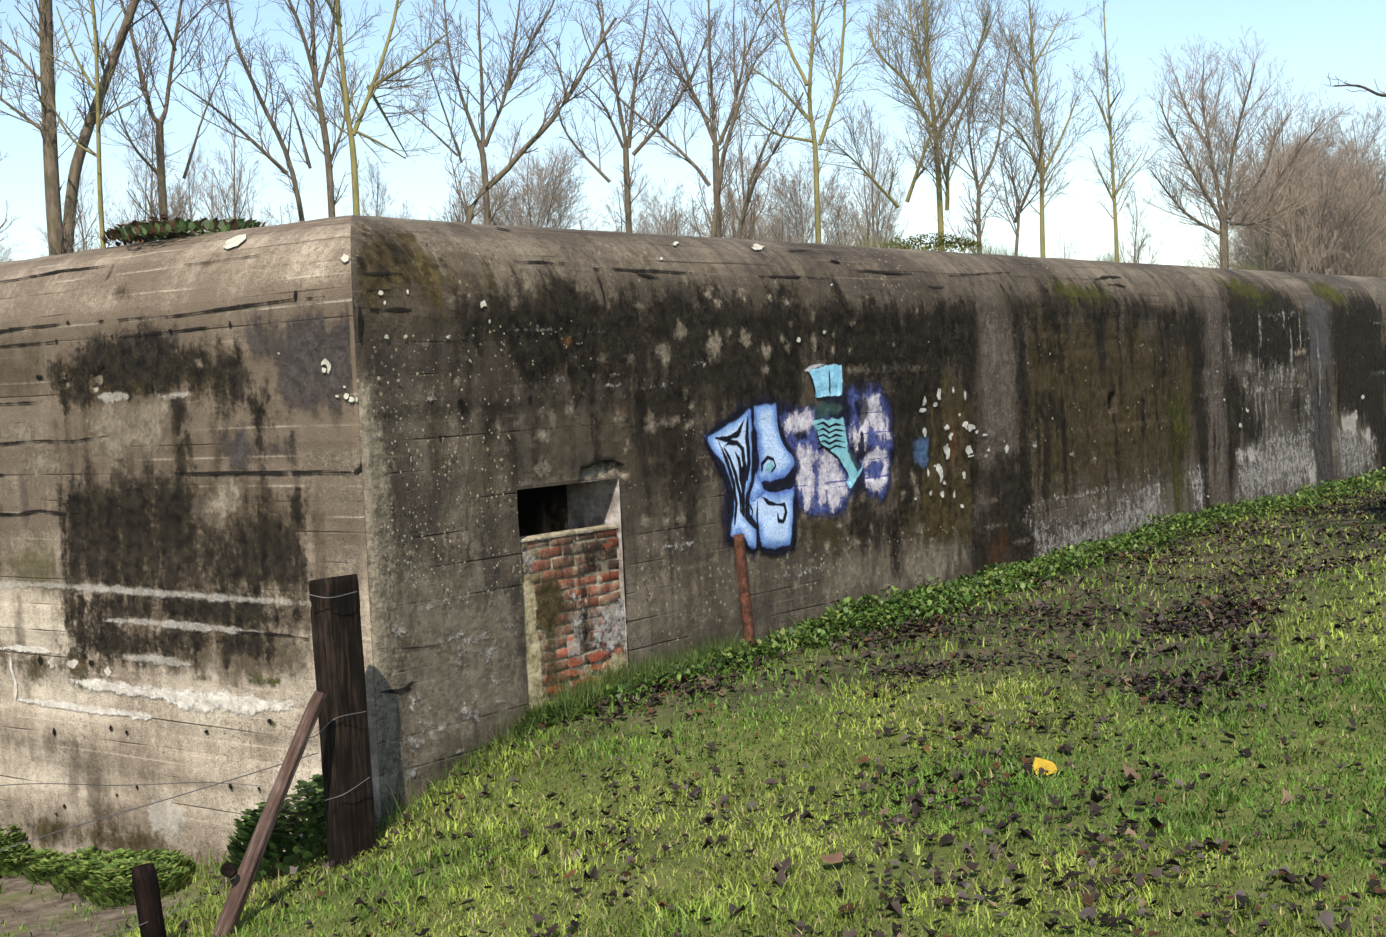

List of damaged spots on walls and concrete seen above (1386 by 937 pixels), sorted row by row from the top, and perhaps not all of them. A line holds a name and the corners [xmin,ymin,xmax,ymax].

damp [0,325,311,720]
damp [358,229,1386,576]